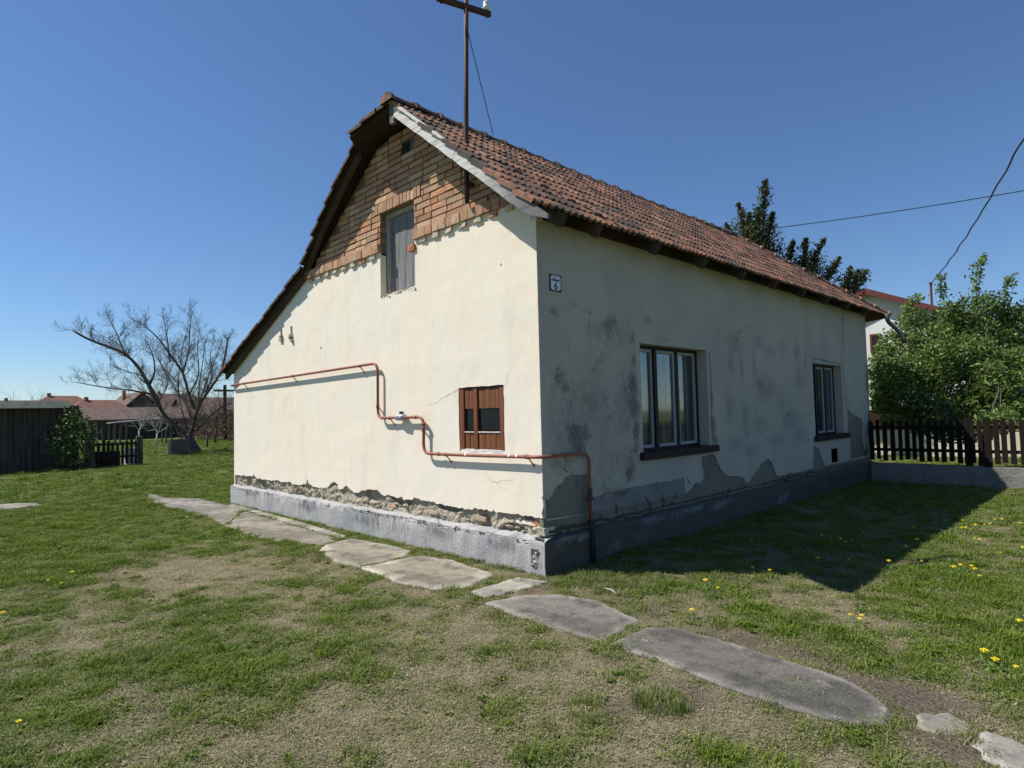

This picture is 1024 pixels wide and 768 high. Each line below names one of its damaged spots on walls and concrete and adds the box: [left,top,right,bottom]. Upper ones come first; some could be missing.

spalling [234,410,872,541]
leakage [555,334,640,497]